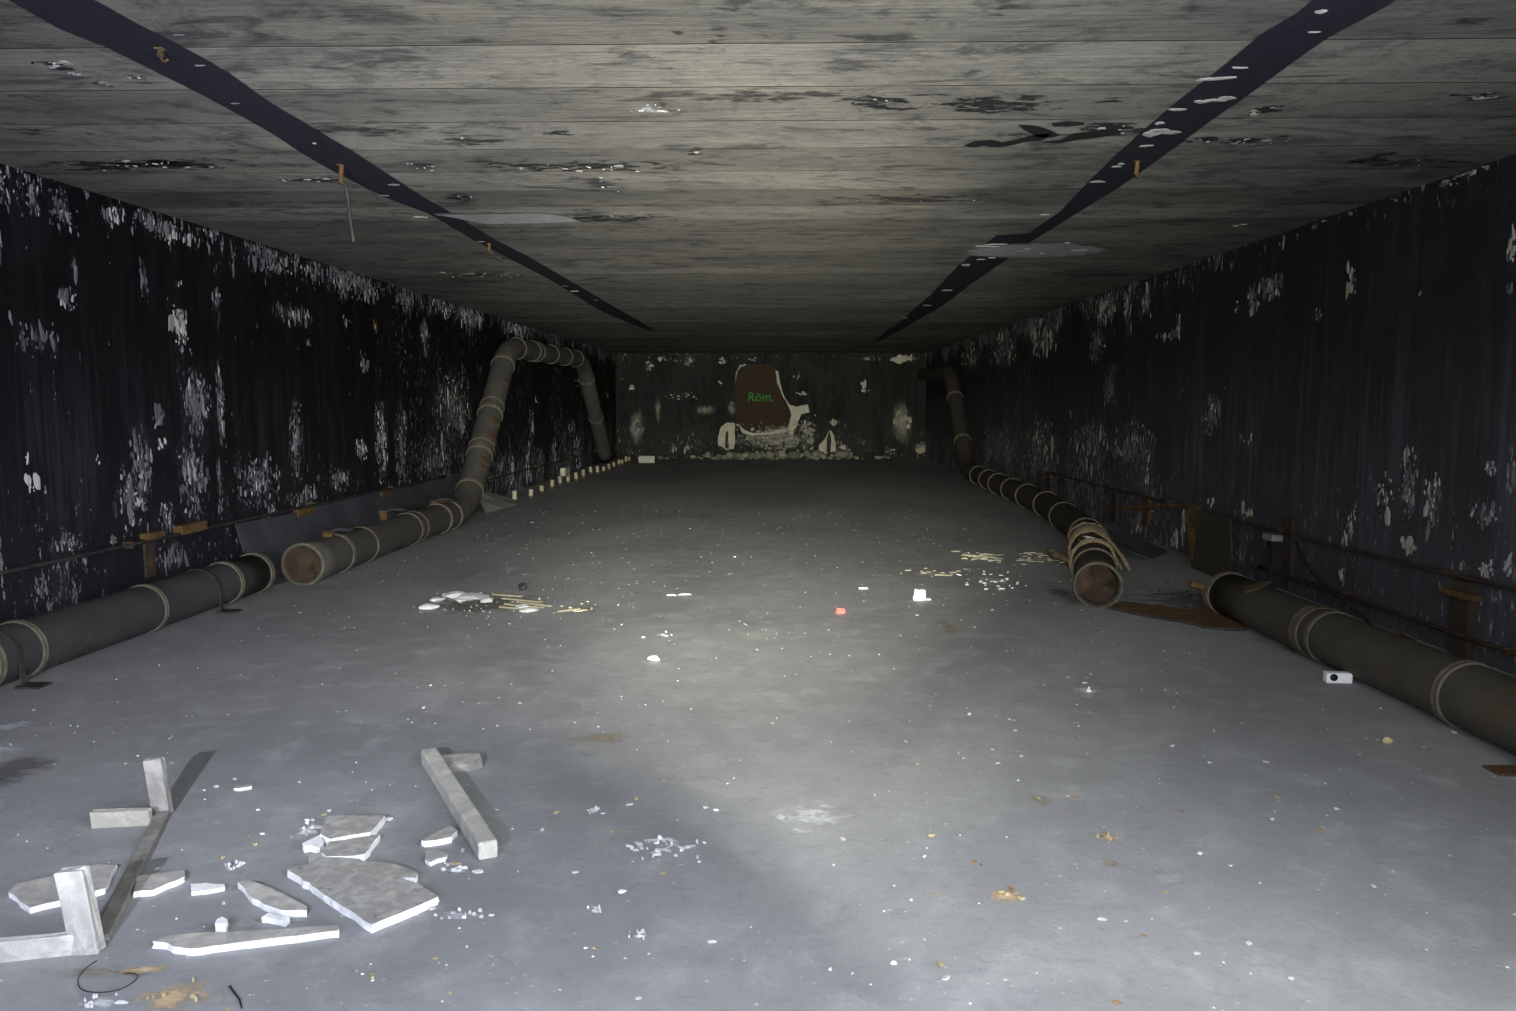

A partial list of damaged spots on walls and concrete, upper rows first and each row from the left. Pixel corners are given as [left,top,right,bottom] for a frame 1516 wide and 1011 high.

peeling [0,170,79,238]
peeling [244,241,412,328]
peeling [1506,223,1516,263]
peeling [168,281,212,440]
peeling [110,402,175,546]
peeling [1375,444,1441,557]